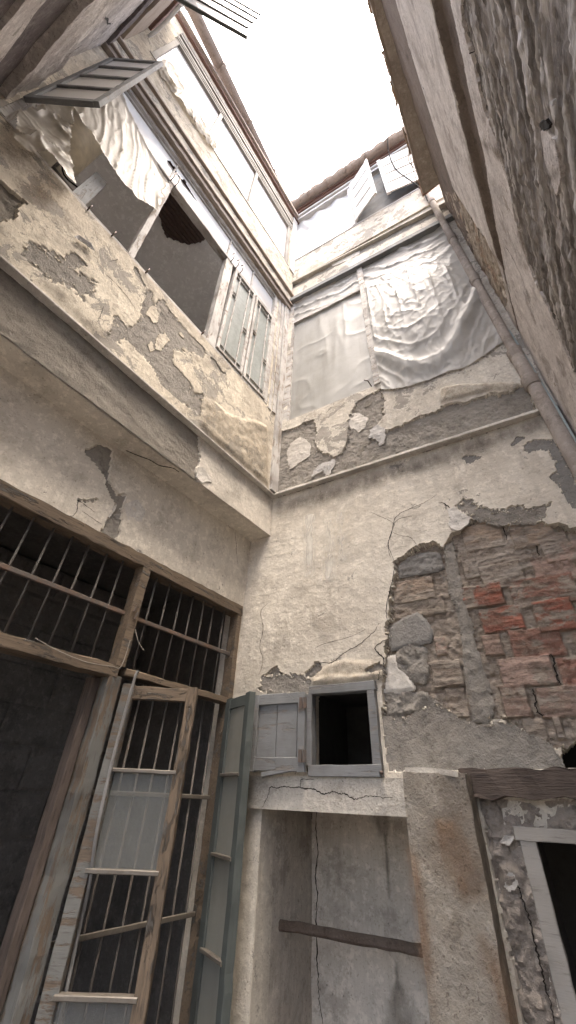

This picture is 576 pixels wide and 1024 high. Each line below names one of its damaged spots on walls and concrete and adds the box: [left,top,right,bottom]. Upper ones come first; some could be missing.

flaking render [0,184,24,222]
spalling [159,193,205,245]
peeling [20,241,97,302]
flaking render [0,268,225,483]
flaking render [84,445,146,539]
flaking render [278,387,536,498]
peeling [511,436,576,509]
peeling [259,663,322,694]
crack [313,499,450,680]
flaking render [366,499,576,768]
crack [264,779,392,1023]
peeling [504,872,518,892]